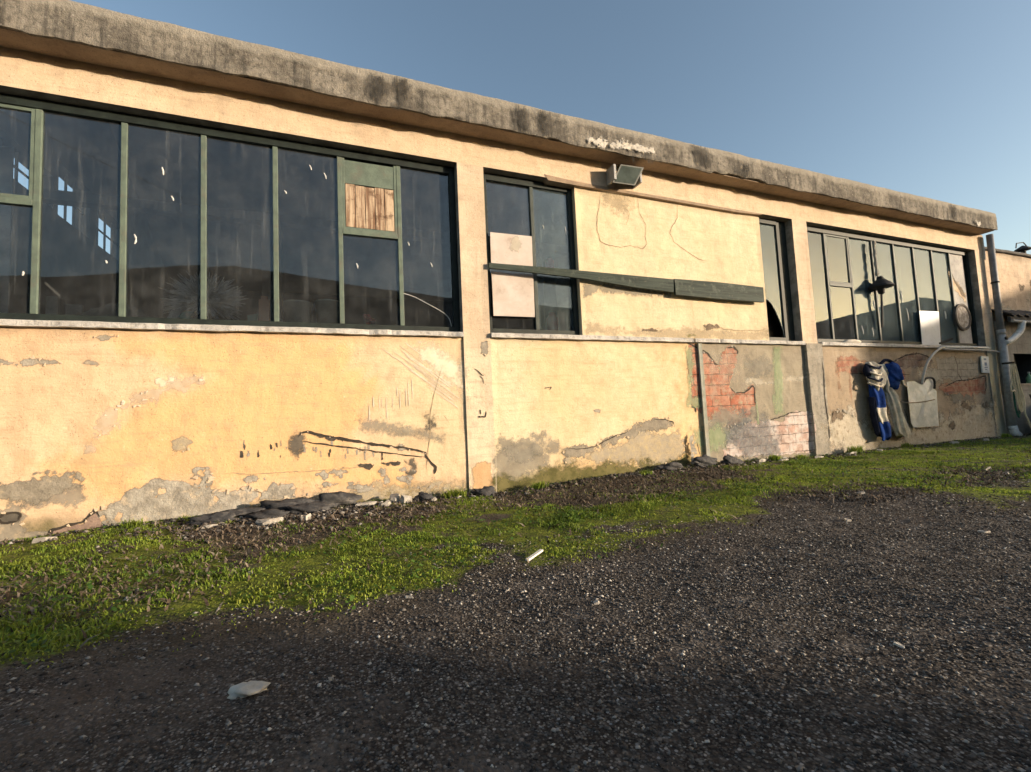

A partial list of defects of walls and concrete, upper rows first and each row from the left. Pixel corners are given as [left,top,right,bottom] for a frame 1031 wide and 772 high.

leakage [369,74,408,108]
leakage [514,107,551,135]
leakage [693,145,711,167]
crack [597,198,705,261]
peeling [0,355,63,366]
spalling [687,343,998,458]
spalling [562,417,701,467]
spalling [0,512,22,525]